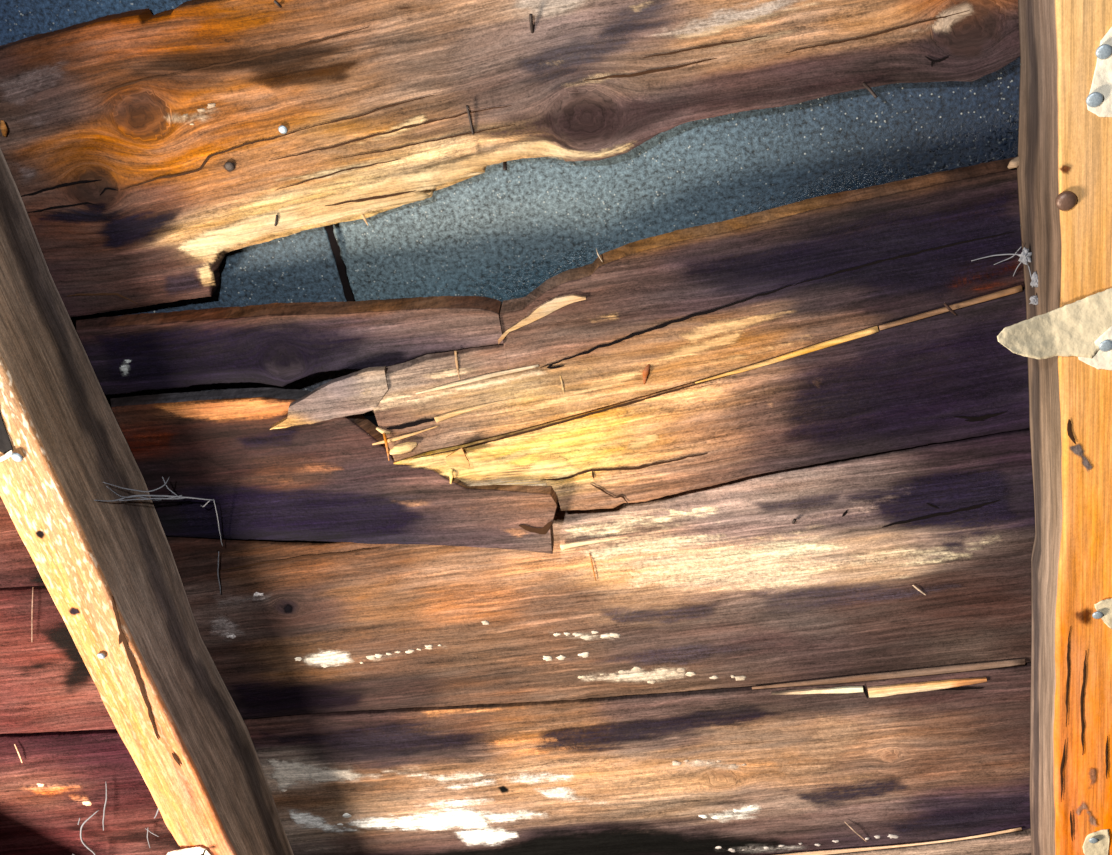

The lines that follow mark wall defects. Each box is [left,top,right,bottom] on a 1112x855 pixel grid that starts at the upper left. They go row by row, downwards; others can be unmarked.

crack [21,95,515,213]
peeling [179,141,631,284]
crack [540,232,1013,369]
peeling [374,369,545,410]
peeling [512,314,774,418]
peeling [403,442,590,486]
leakage [295,644,442,668]
leakage [543,605,710,661]
leakage [578,645,731,684]
leakage [538,708,778,752]
crack [1060,626,1108,841]
leakage [291,773,839,855]